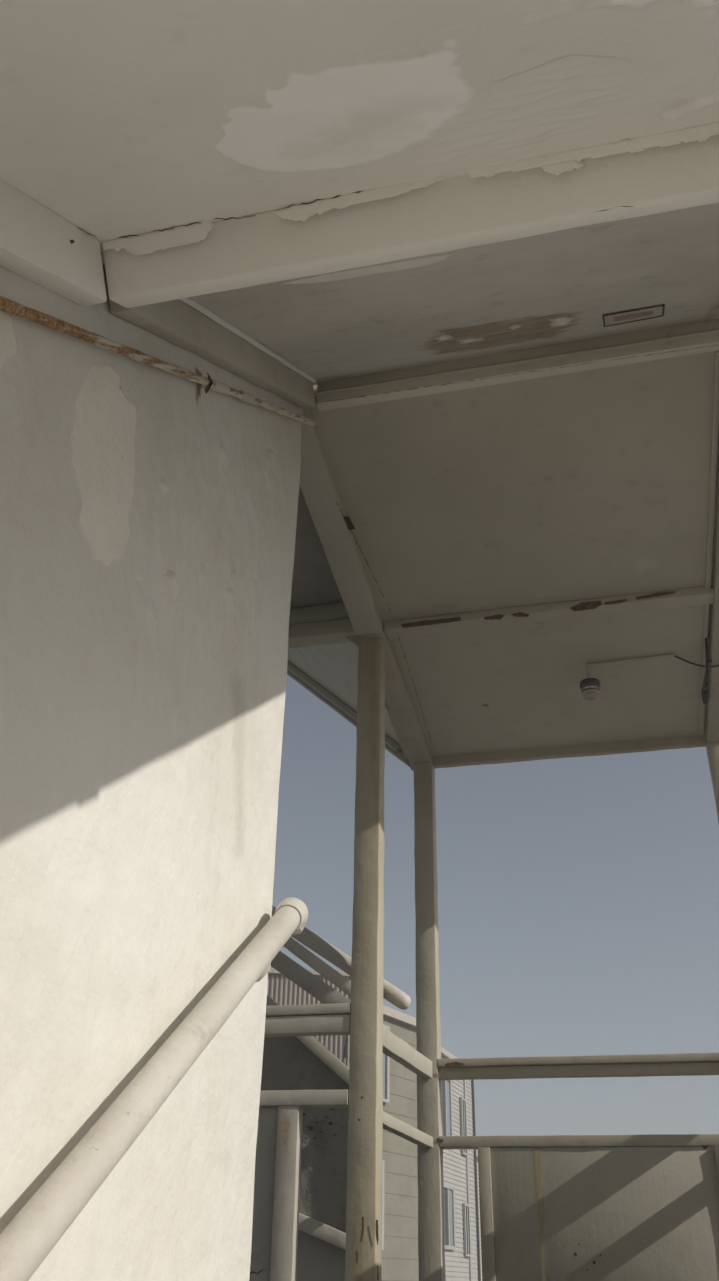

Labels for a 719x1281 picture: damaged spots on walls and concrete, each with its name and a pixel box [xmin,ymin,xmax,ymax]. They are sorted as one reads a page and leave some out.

peeling [211,22,494,174]
peeling [466,122,719,178]
peeling [275,176,446,221]
peeling [102,220,213,256]
peeling [401,617,461,628]
peeling [484,612,530,620]
peeling [570,591,675,611]